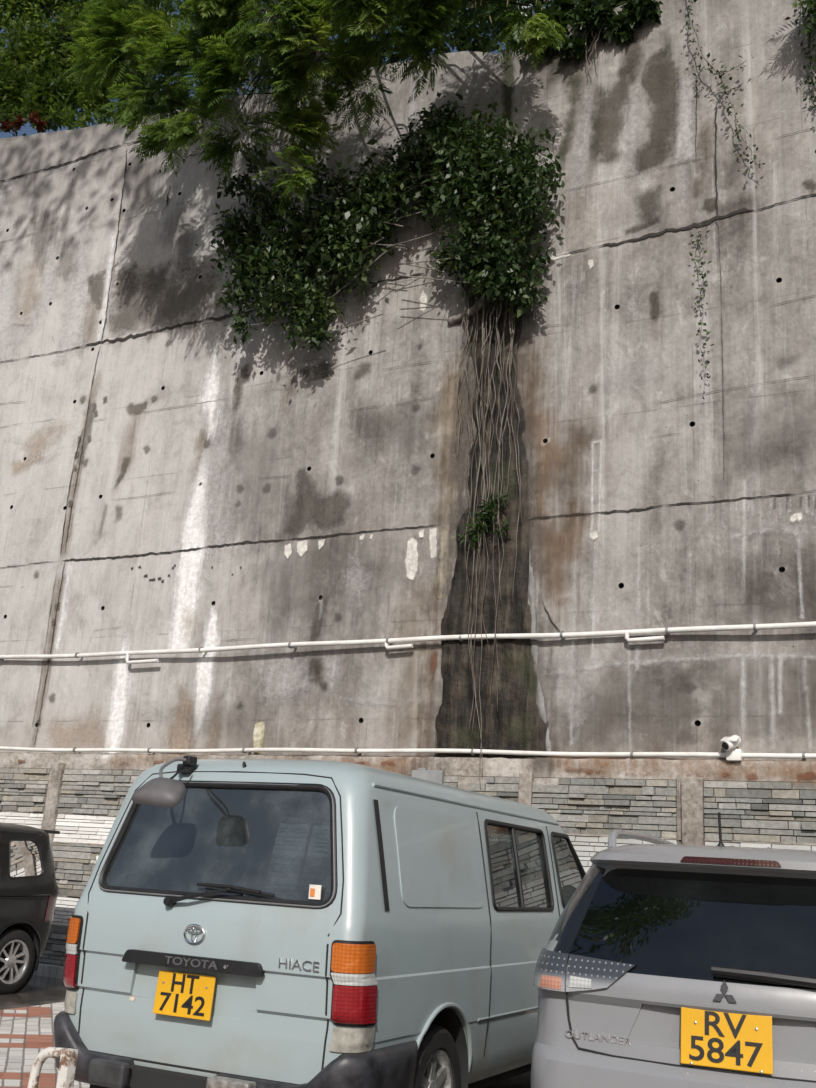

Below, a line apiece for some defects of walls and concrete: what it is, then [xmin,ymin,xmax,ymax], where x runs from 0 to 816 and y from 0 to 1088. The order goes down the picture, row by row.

leakage [557,27,695,188]
leakage [626,186,660,233]
leakage [301,361,333,379]
leakage [286,469,350,533]
spalling [284,539,325,559]
spalling [405,527,456,599]